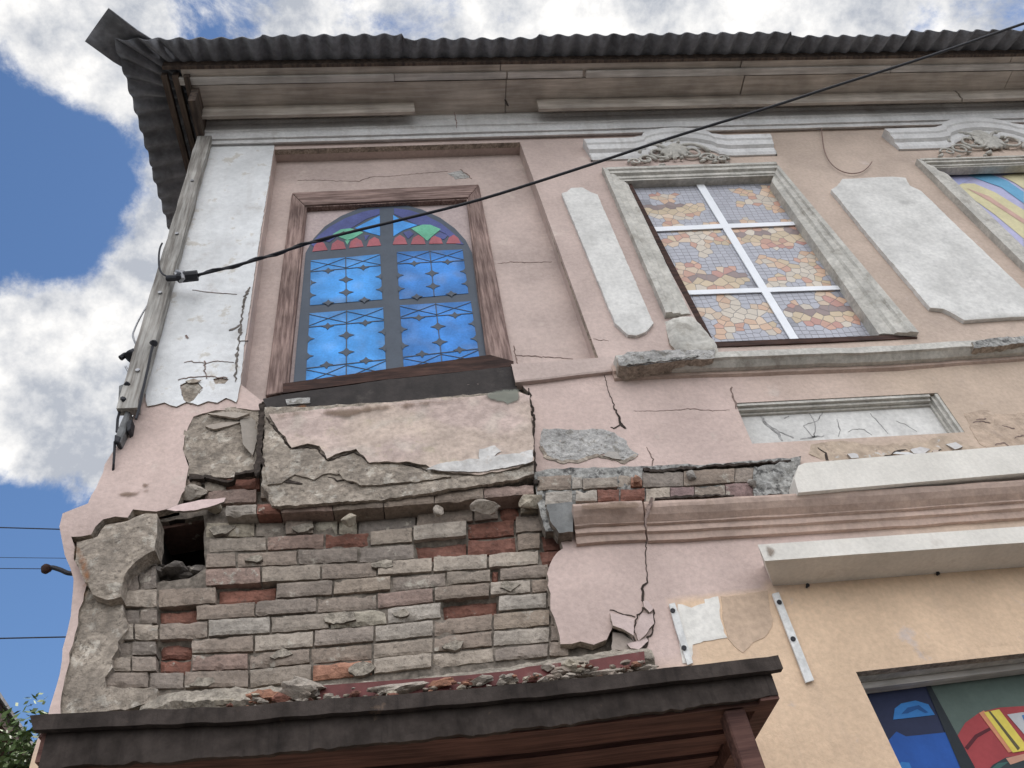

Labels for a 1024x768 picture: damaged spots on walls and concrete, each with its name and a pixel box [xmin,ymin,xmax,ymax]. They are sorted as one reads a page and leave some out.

crack [178,287,251,381]
peeling [182,379,202,405]
crack [604,375,626,429]
crack [659,387,917,441]
flaking render [62,407,1024,713]
crack [610,497,655,651]